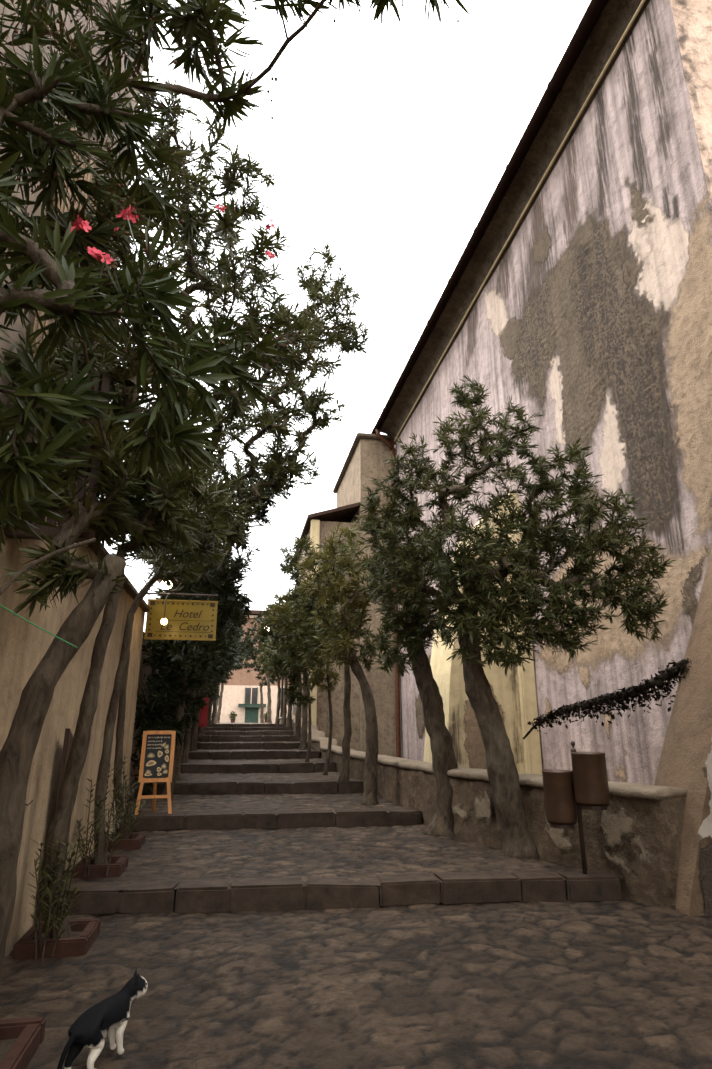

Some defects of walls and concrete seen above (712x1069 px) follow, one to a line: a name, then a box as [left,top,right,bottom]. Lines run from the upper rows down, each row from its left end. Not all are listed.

water stain [622,5,671,190]
water stain [465,300,478,370]
water stain [496,132,578,403]
water stain [573,82,683,554]